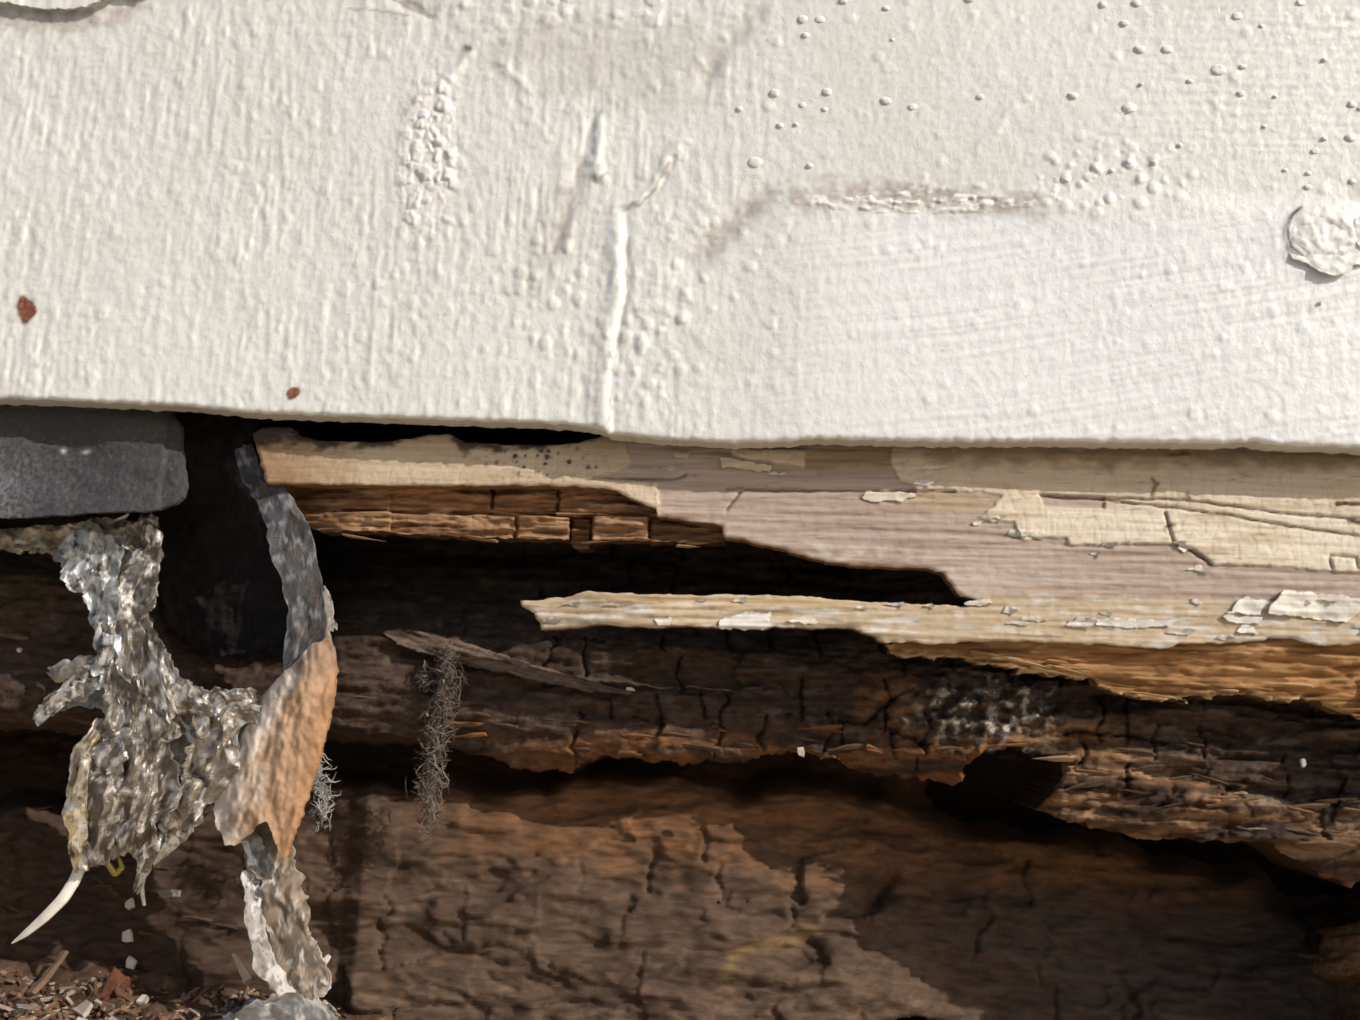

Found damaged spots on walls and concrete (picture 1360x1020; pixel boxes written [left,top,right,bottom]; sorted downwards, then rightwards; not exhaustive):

crack [0,0,102,10]
corrosion [17,296,37,323]
corrosion [287,387,300,399]
peeling [720,457,786,476]
peeling [862,465,949,502]
crack [1133,452,1206,527]
crack [1263,502,1360,533]
peeling [719,597,772,631]
peeling [788,617,818,625]
spalling [884,590,1360,720]
peeling [122,929,138,969]
peeling [136,994,149,1005]